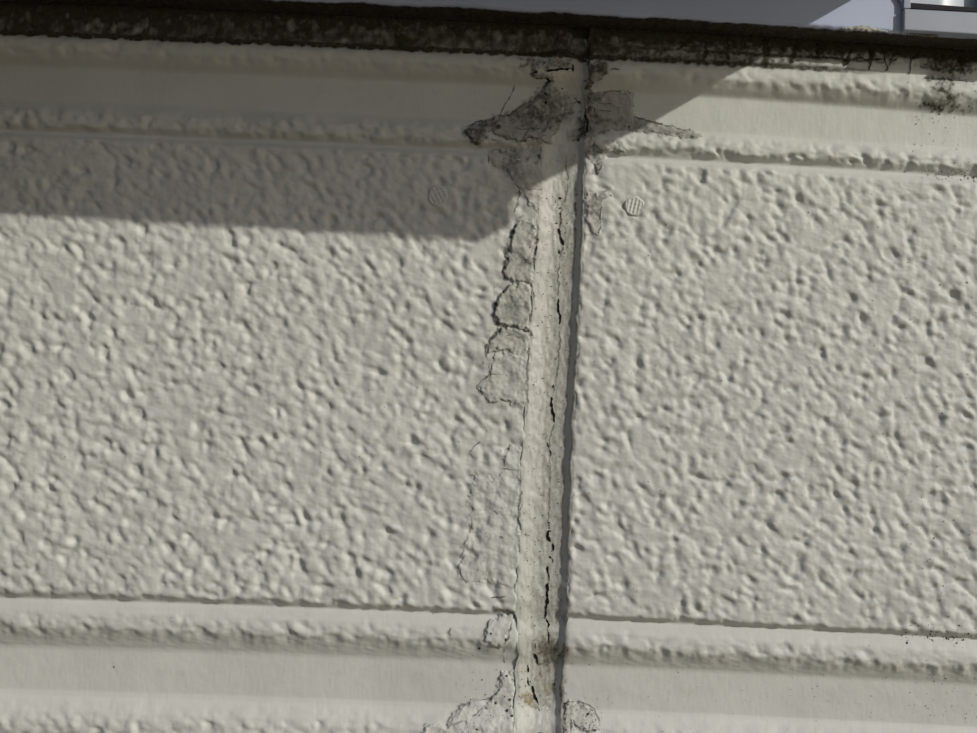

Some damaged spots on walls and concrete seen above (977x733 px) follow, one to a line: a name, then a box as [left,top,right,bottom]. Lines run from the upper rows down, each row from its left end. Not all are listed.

damp [0,0,977,132]
peeling [459,444,524,588]
crack [527,166,569,733]